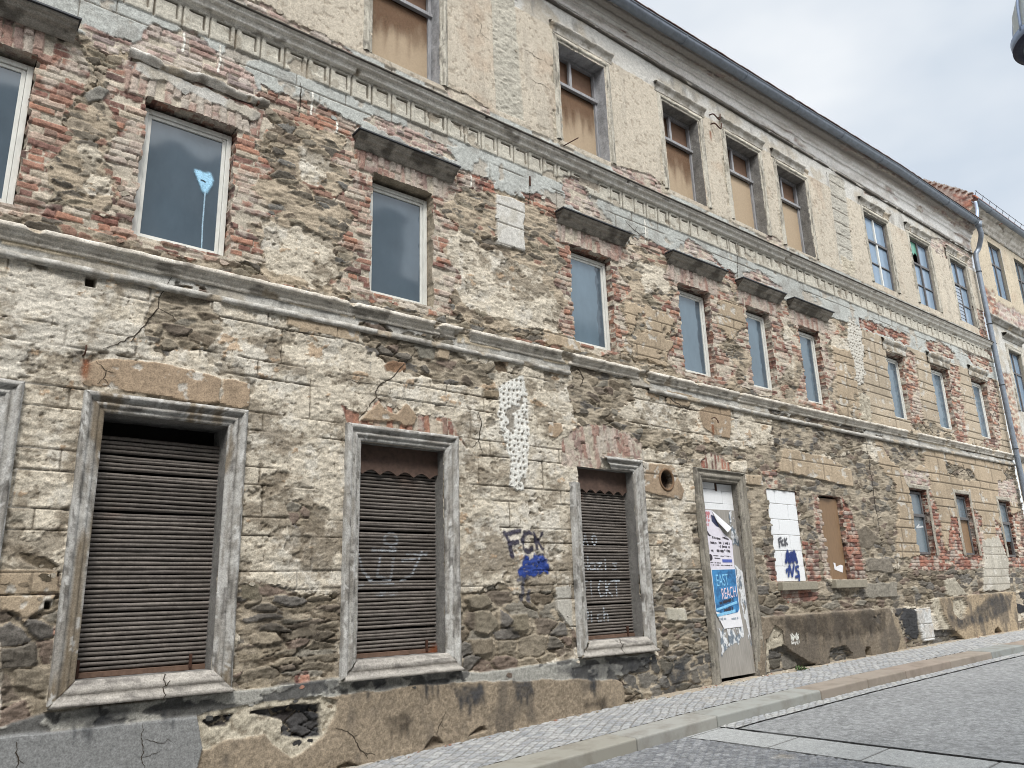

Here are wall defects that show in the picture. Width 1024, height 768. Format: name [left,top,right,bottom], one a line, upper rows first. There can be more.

spalling [0,22,911,421]
crack [96,277,174,387]
crack [349,349,418,418]
spalling [548,365,1024,673]
peeling [0,552,712,757]
leakage [456,685,484,711]